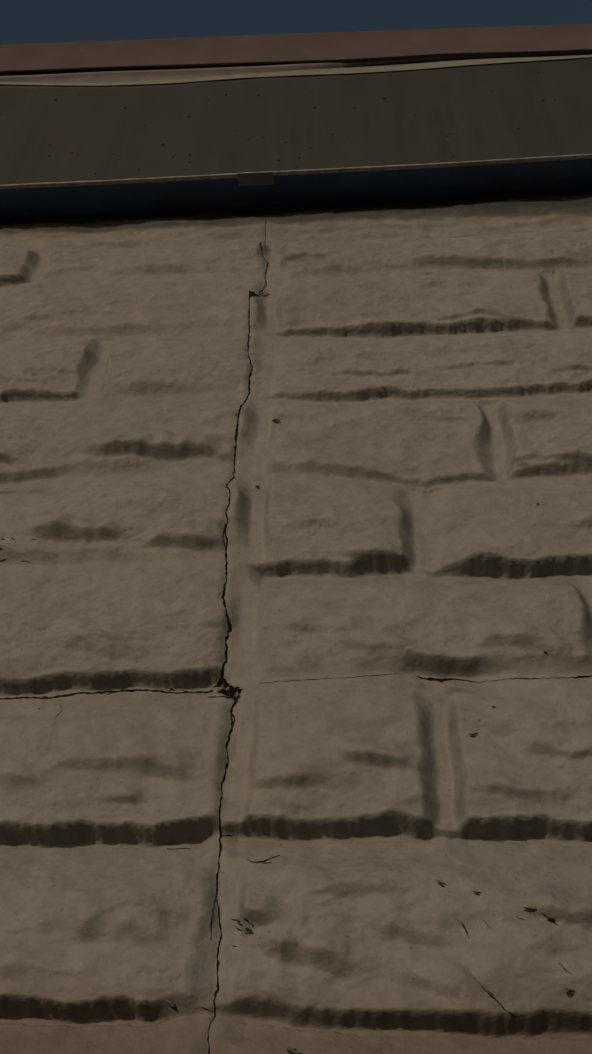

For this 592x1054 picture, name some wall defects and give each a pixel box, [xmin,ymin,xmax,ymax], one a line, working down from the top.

crack [0,221,269,1054]
crack [264,673,592,683]